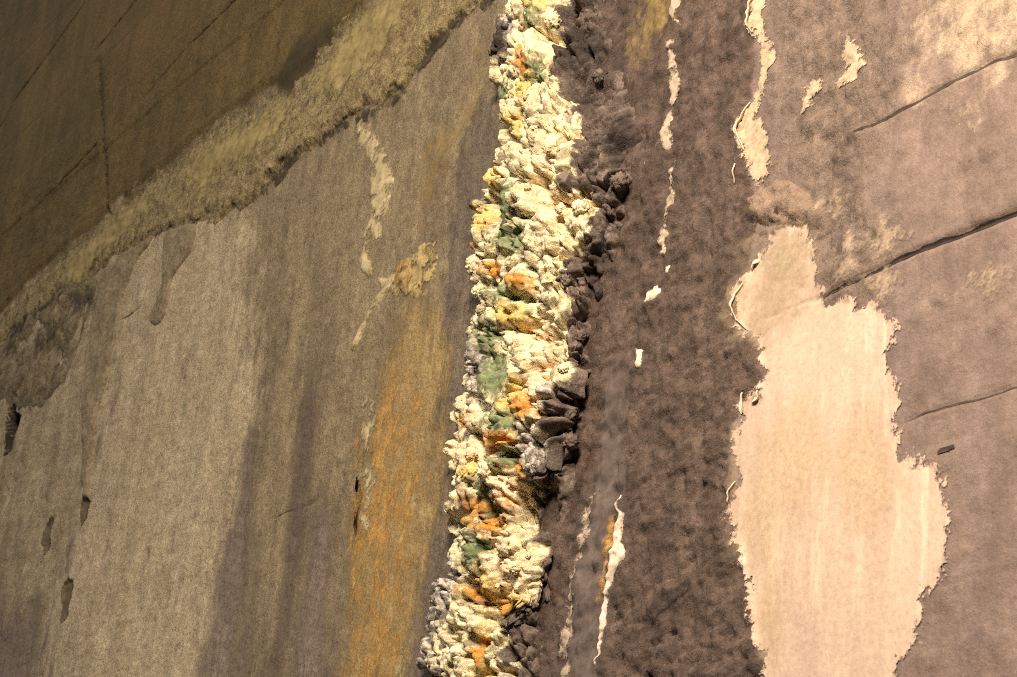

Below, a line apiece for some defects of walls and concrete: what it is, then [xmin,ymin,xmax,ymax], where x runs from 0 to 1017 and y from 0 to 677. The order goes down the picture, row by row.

corrosion [336,288,452,677]
leakage [416,0,643,677]
peeling [722,0,954,677]
crack [824,211,1017,298]
crack [848,53,1017,133]
crack [908,387,1017,421]